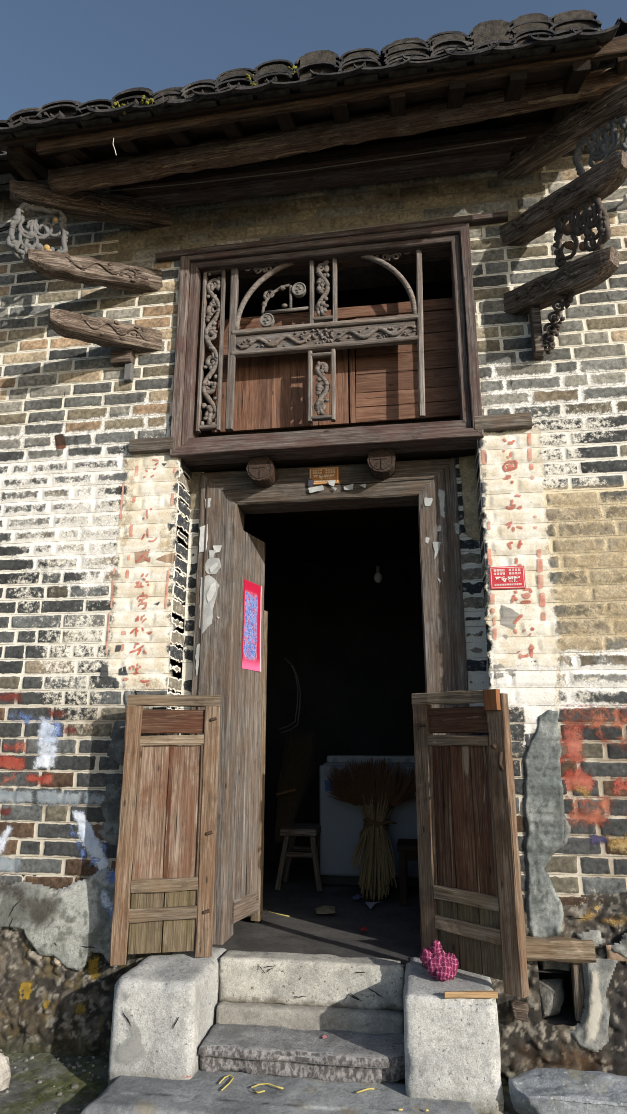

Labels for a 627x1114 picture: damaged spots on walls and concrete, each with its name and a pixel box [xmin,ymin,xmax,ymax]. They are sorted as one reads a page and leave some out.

peeling [0,398,179,692]
peeling [480,358,627,747]
peeling [0,869,117,971]